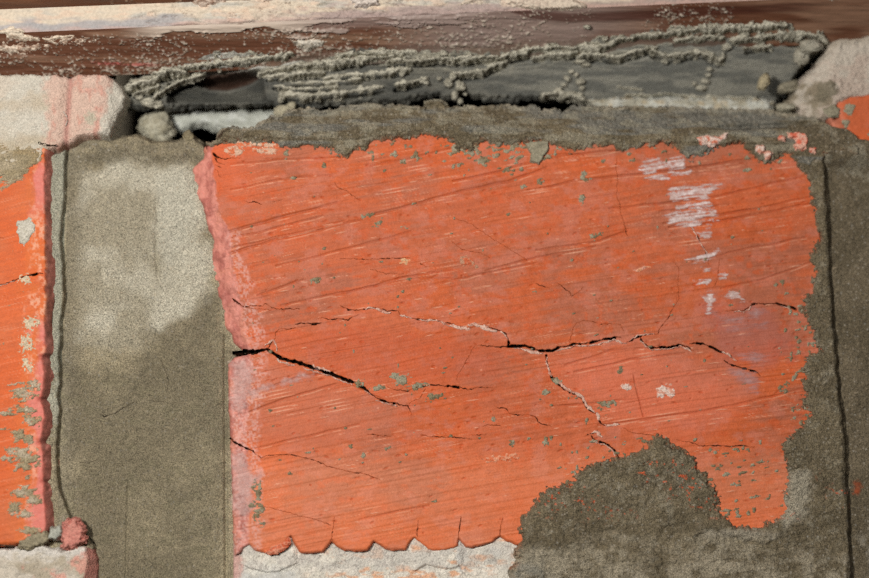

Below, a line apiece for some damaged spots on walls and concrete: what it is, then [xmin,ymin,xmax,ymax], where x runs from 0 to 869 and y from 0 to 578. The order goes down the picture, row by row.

crack [708,302,796,313]
peeling [18,316,41,373]
crack [232,262,759,459]
crack [229,438,380,480]